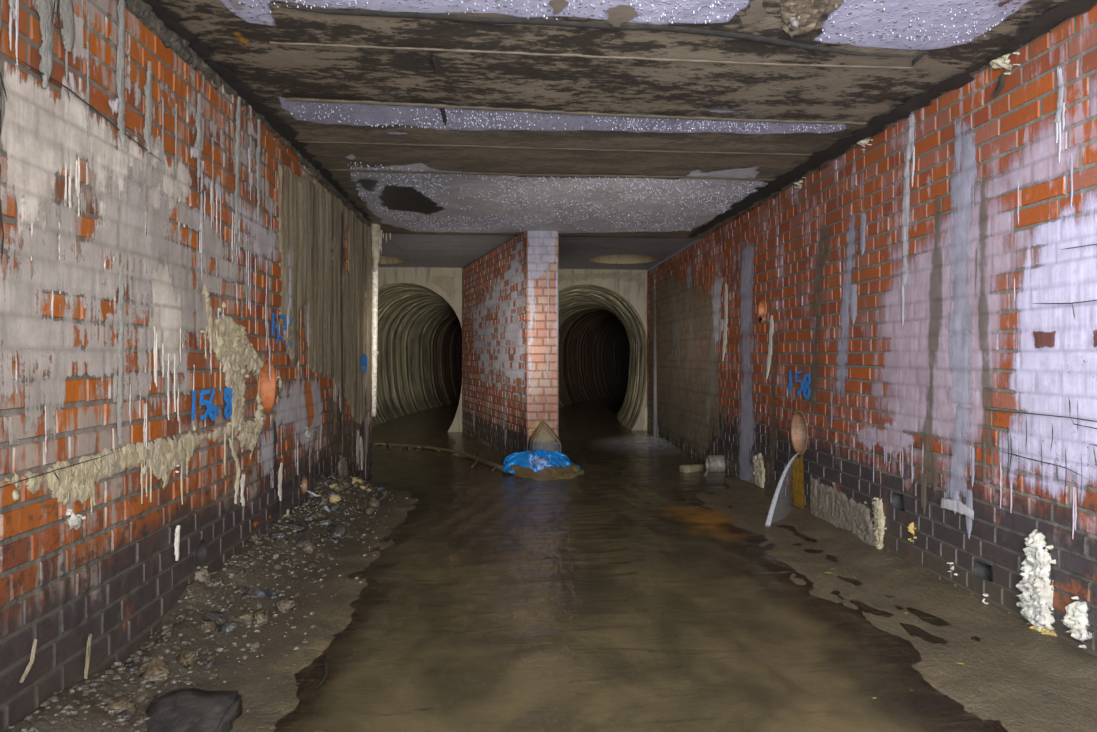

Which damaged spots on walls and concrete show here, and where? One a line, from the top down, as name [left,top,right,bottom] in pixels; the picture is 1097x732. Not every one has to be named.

water stain [605,5,640,27]
spalling [357,179,444,215]
water stain [0,0,372,530]
water stain [688,0,1097,542]
water stain [469,235,780,488]
water stain [872,497,887,550]
water stain [1016,529,1092,649]